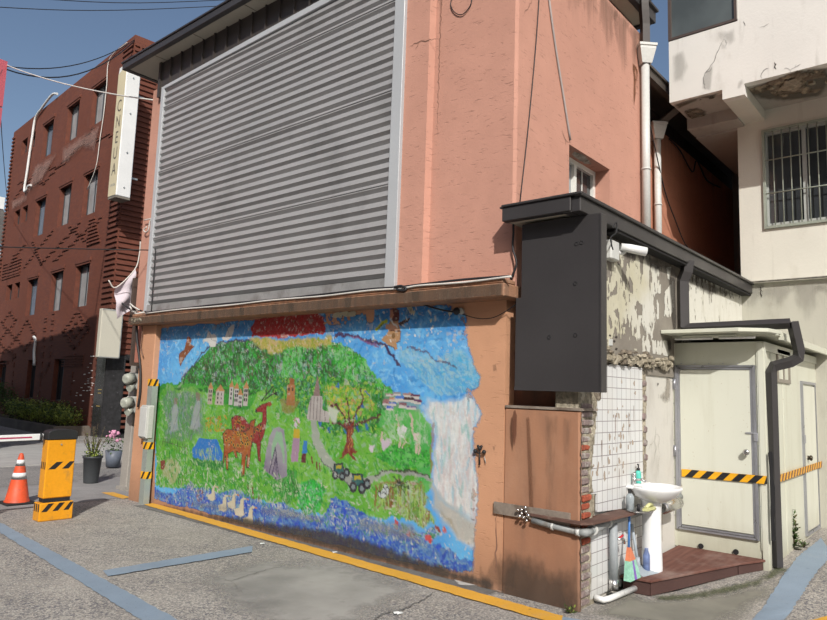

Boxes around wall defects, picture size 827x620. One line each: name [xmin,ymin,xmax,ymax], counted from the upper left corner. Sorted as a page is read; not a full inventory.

spalling [749,69,827,97]
peeling [607,249,672,356]
peeling [689,275,742,323]
flaking render [556,370,648,609]
leakage [183,509,491,588]
leakage [502,562,570,609]